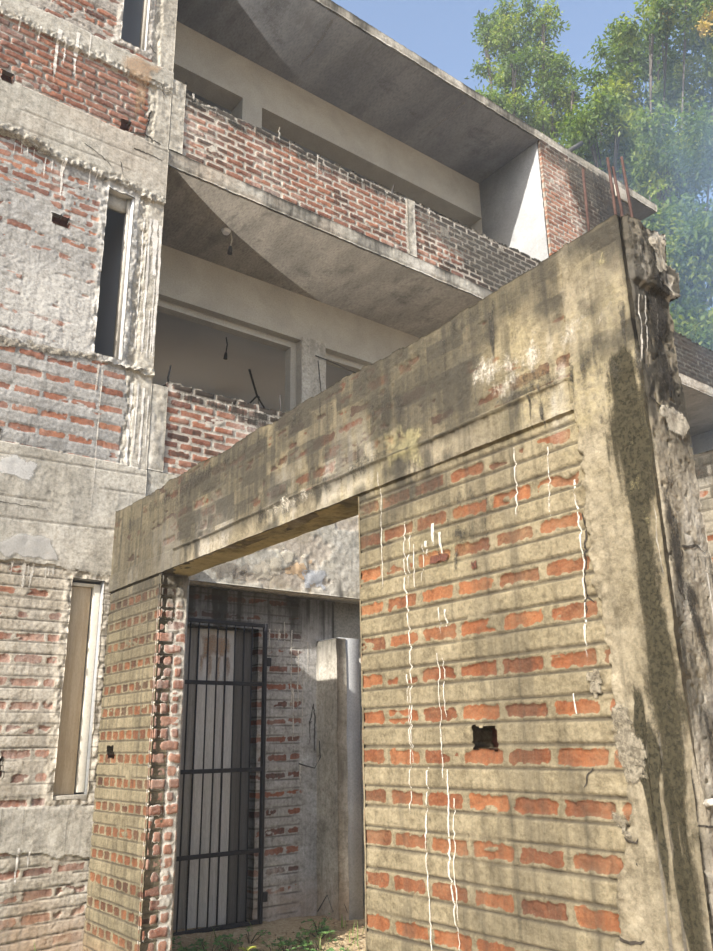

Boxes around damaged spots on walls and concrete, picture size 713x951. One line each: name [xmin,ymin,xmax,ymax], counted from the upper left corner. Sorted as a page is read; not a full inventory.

efflorescence [53,28,92,79]
efflorescence [14,143,68,195]
spalling [648,236,668,272]
damp [619,294,659,391]
spalling [660,405,690,439]
damp [574,479,587,645]
damp [403,523,443,808]
damp [436,653,460,947]
damp [424,770,432,951]